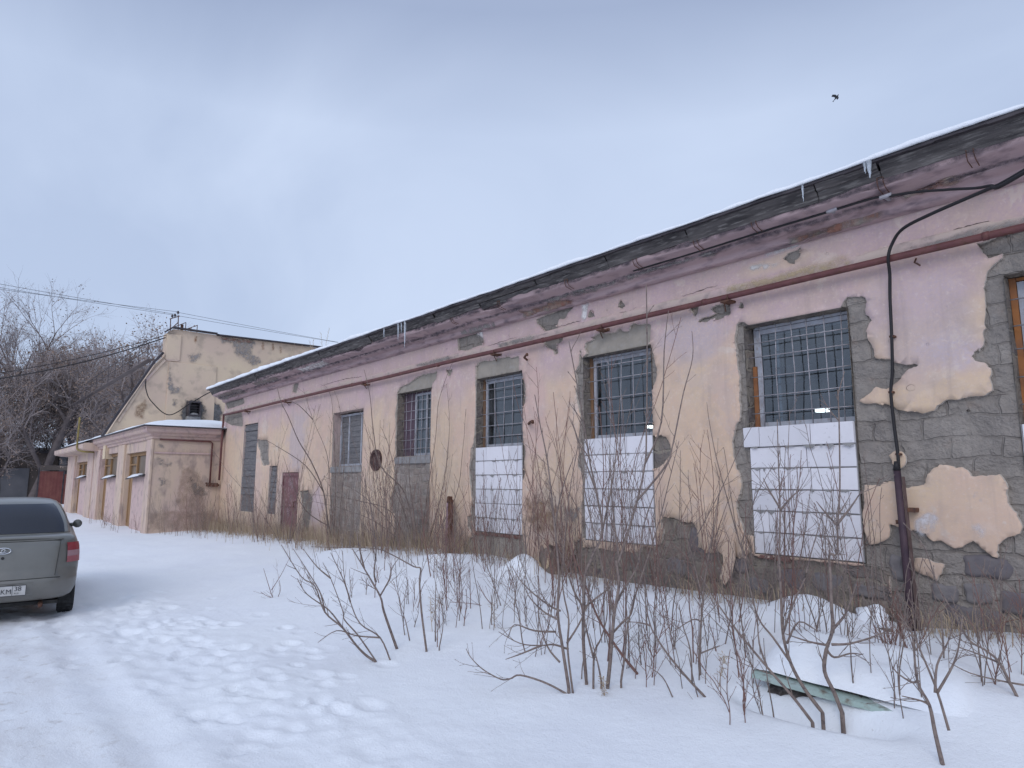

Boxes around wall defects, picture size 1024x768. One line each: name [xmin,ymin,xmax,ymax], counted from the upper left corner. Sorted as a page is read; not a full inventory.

flaking render [221,337,261,365]
flaking render [459,332,484,351]
flaking render [538,304,595,354]
flaking render [568,218,1024,634]